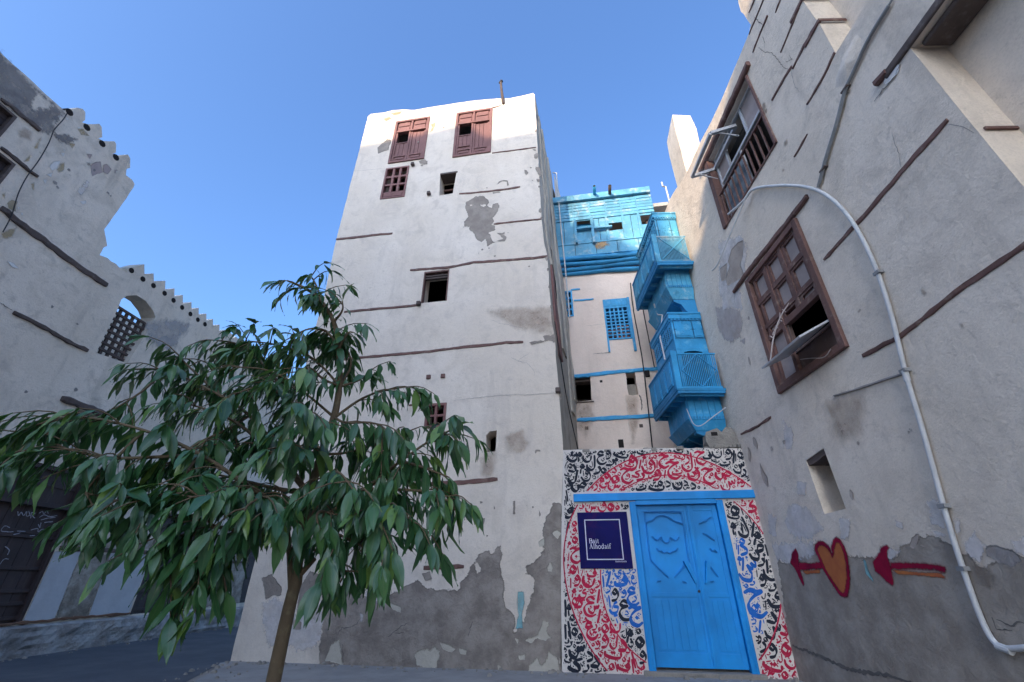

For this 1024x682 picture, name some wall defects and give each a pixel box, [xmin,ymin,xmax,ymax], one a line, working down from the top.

damp [0,52,76,144]
spalling [464,180,509,257]
flaking render [319,502,562,672]
flaking render [777,531,1024,682]